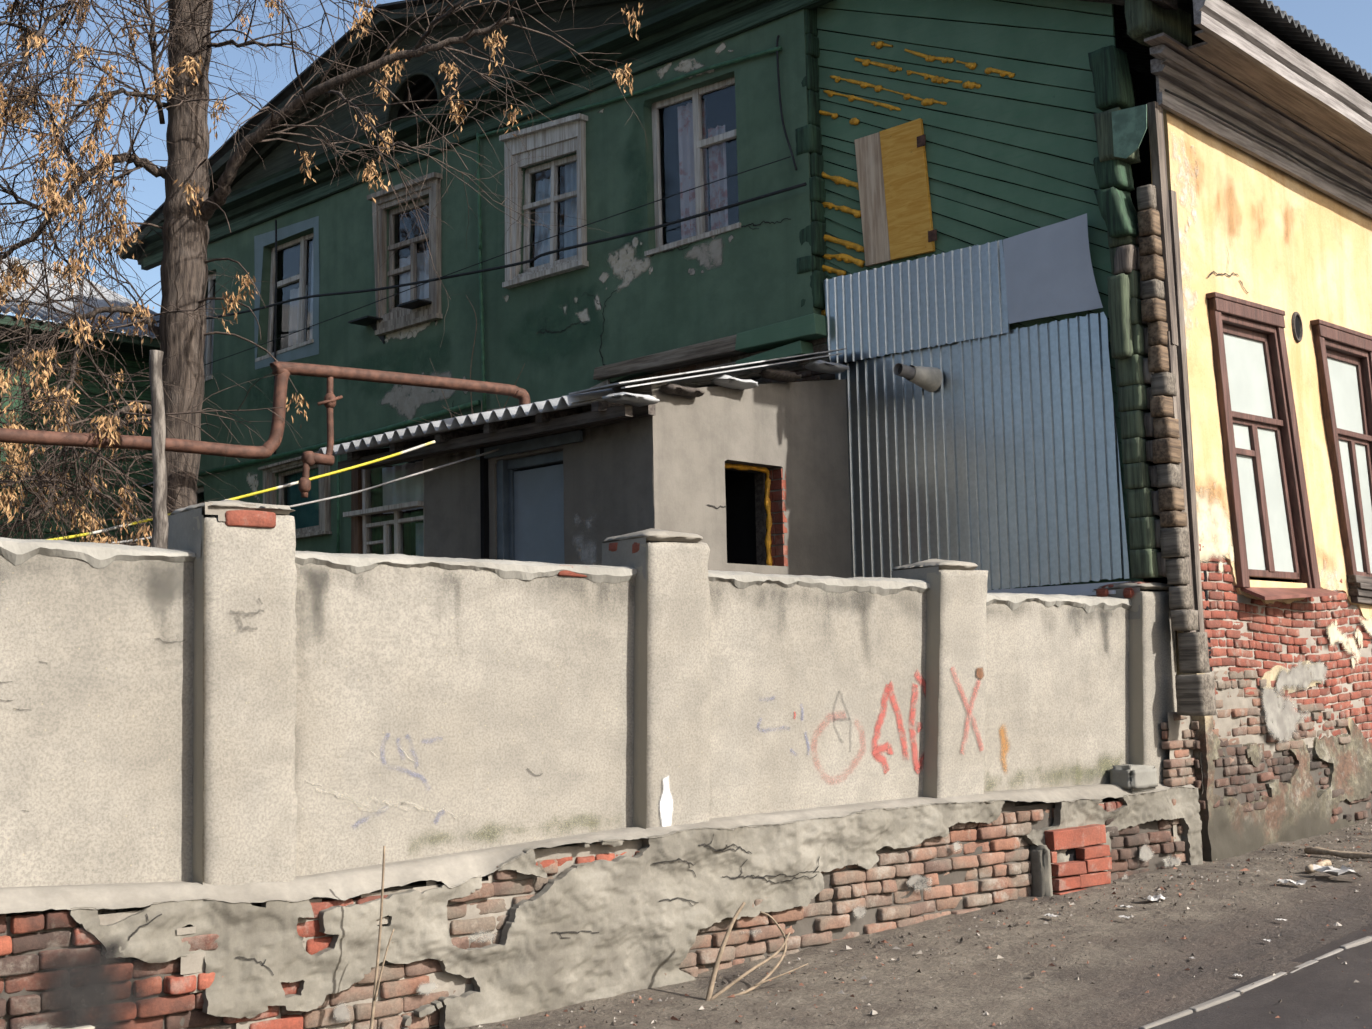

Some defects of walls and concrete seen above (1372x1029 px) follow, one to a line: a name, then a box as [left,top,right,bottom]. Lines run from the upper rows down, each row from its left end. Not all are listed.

peeling [658,43,732,79]
peeling [563,237,653,322]
peeling [686,235,733,275]
peeling [381,372,468,421]
spalling [1190,483,1372,824]
spalling [297,839,643,955]
crack [651,834,820,906]
spalling [665,802,1055,977]
spalling [0,909,475,1029]